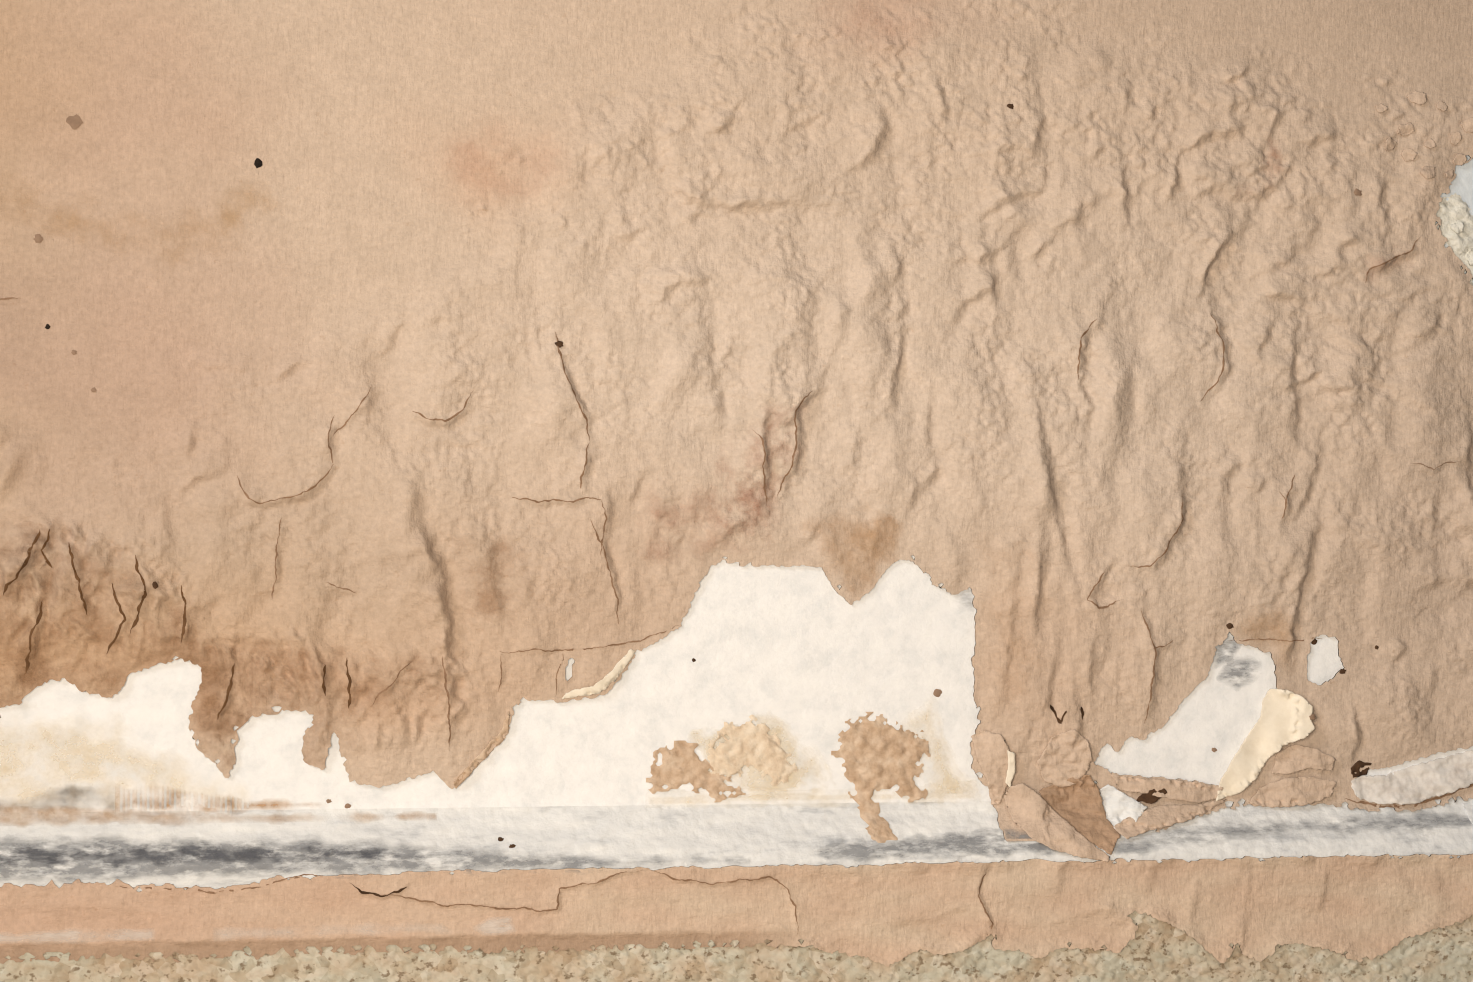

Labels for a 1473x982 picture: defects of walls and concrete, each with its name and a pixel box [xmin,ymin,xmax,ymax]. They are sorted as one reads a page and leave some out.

peeling [1385,117,1473,286]
peeling [0,555,1473,862]
leakage [7,845,278,866]
leakage [308,847,380,860]
crack [978,874,993,929]